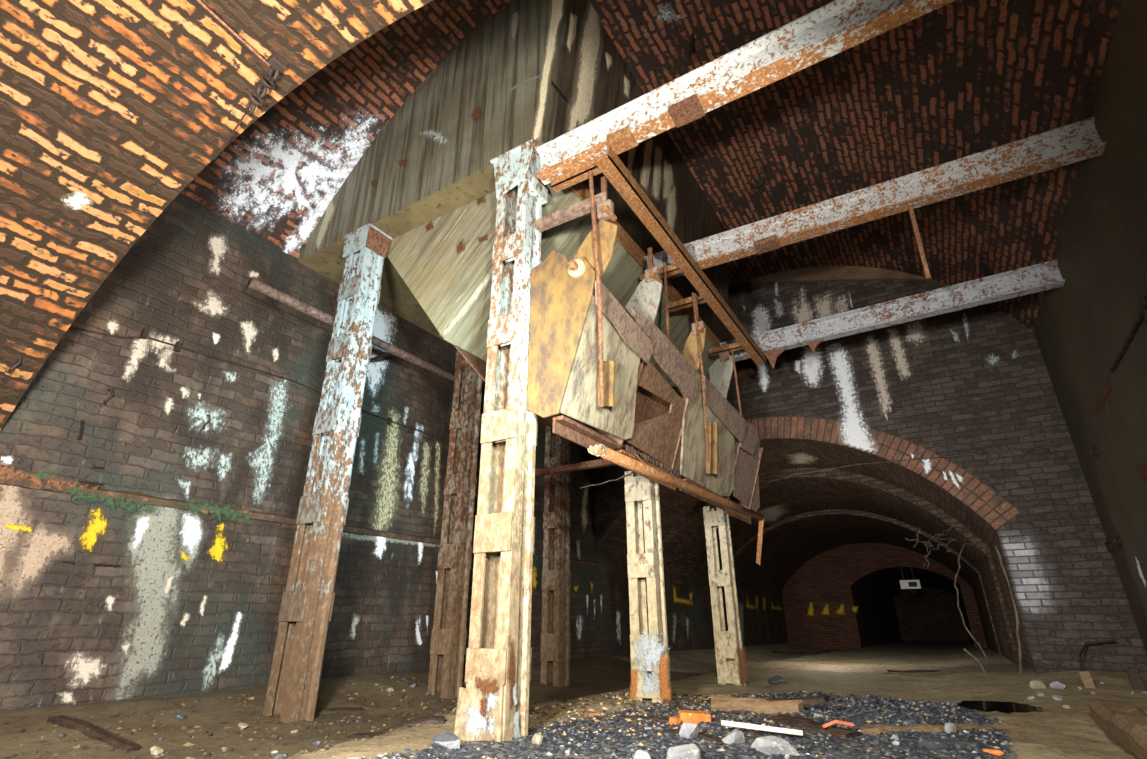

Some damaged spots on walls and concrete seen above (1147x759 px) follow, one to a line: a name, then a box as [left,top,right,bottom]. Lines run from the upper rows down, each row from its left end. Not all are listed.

leakage [219,113,379,254]
leakage [123,333,177,379]
leakage [164,387,225,432]
leakage [194,290,227,315]
leakage [208,234,227,274]
leakage [240,321,258,353]
leakage [246,379,288,503]
leakage [342,309,441,563]
leakage [795,343,875,454]
leakage [863,319,927,421]
leakage [61,447,232,703]
corrosion [475,642,515,717]